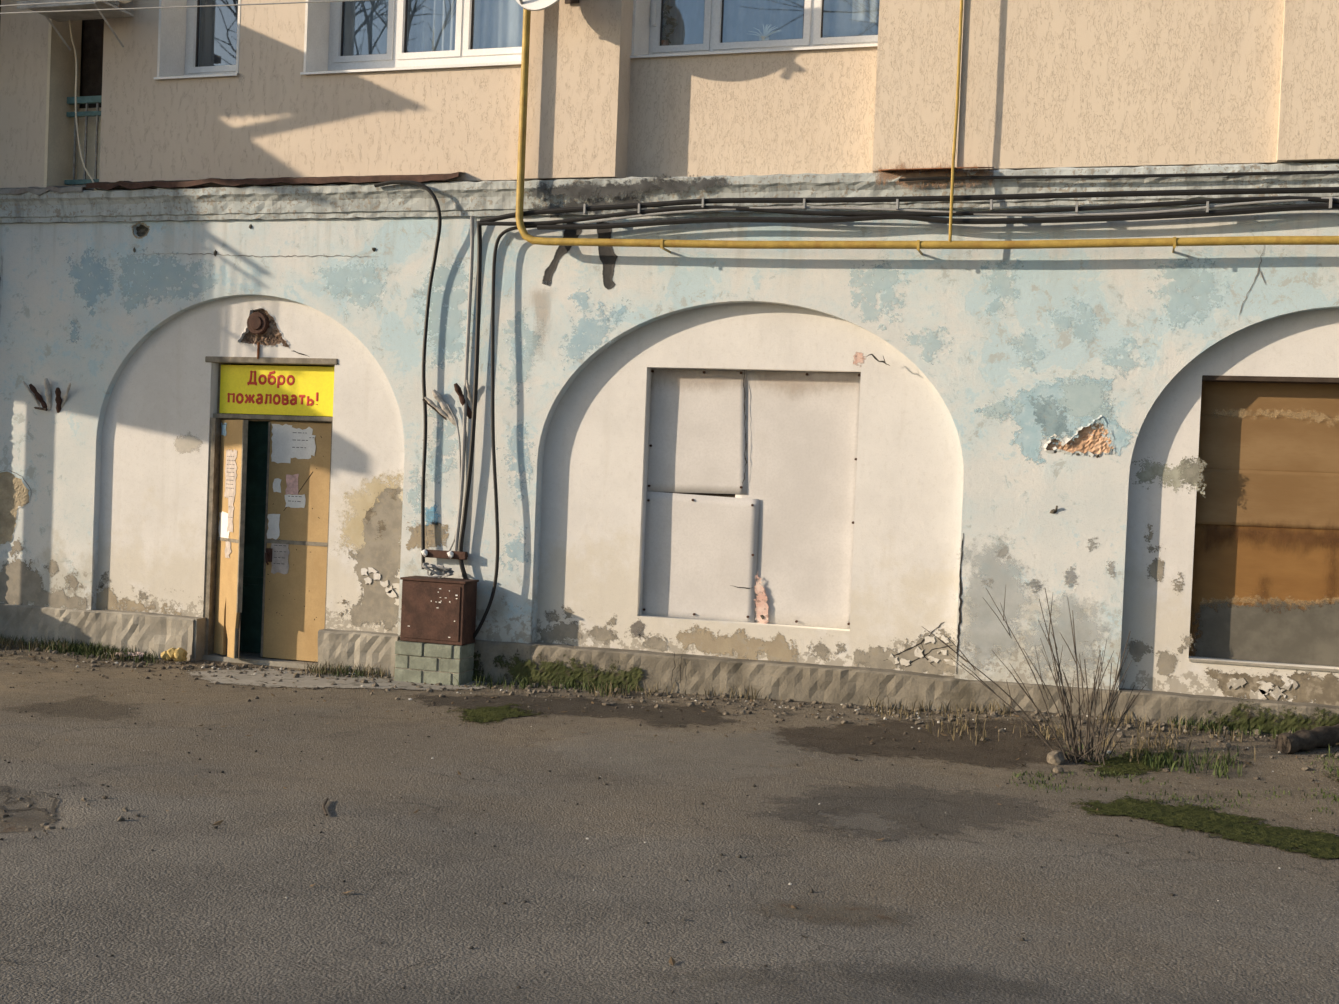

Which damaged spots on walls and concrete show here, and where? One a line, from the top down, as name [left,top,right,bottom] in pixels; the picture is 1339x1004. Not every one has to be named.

peeling [558,289,628,370]
peeling [974,371,1207,495]
peeling [0,470,182,615]
flaking render [339,473,450,631]
peeling [538,605,617,646]
flaking render [638,575,956,676]